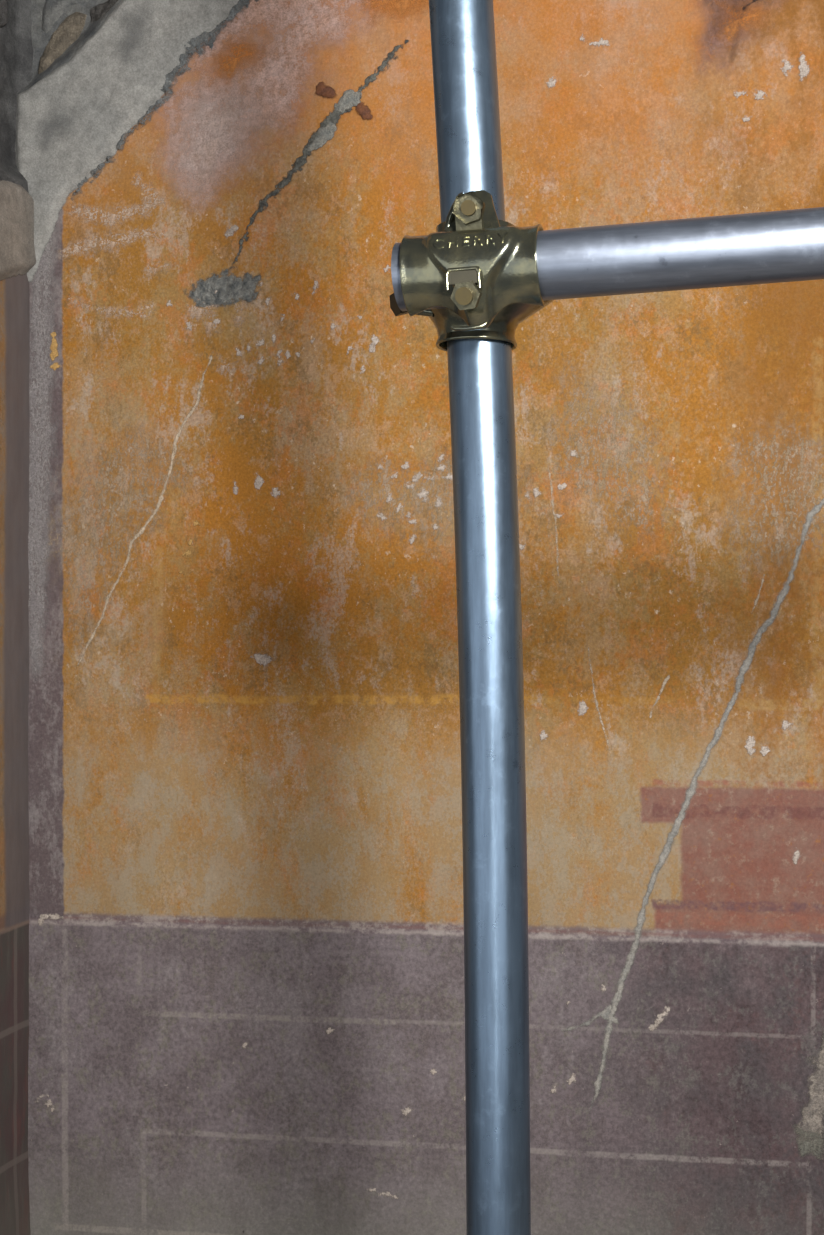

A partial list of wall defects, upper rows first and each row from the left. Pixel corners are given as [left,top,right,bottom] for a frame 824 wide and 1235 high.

crack [233,40,409,264]
spalling [186,268,270,331]
peeling [219,334,300,372]
crack [78,356,212,664]
crack [562,499,824,1102]
peeling [794,1032,824,1159]